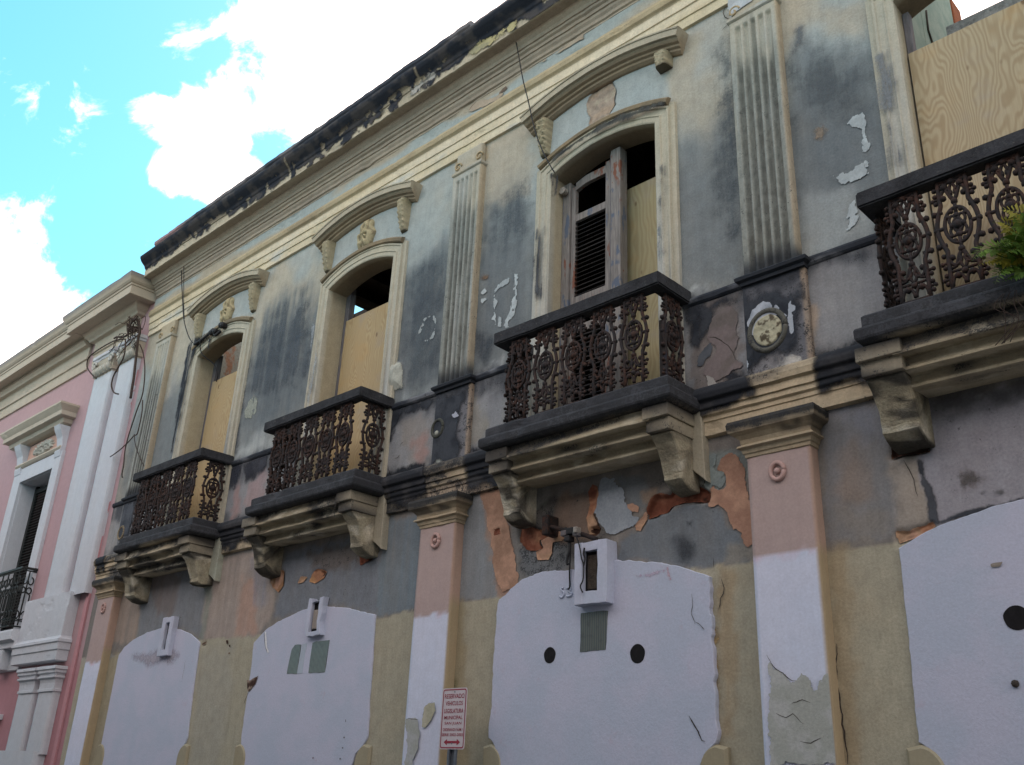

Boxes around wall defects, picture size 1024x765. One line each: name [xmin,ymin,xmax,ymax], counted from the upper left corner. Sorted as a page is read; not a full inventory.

damp [140,0,559,270]
flaking render [586,82,616,124]
peeling [833,112,871,184]
peeling [846,200,859,230]
damp [244,306,317,401]
peeling [481,274,518,328]
flaking render [697,306,743,386]
flaking render [480,490,564,592]
flaking render [586,453,752,547]
peeling [767,656,836,765]
crack [836,644,848,764]